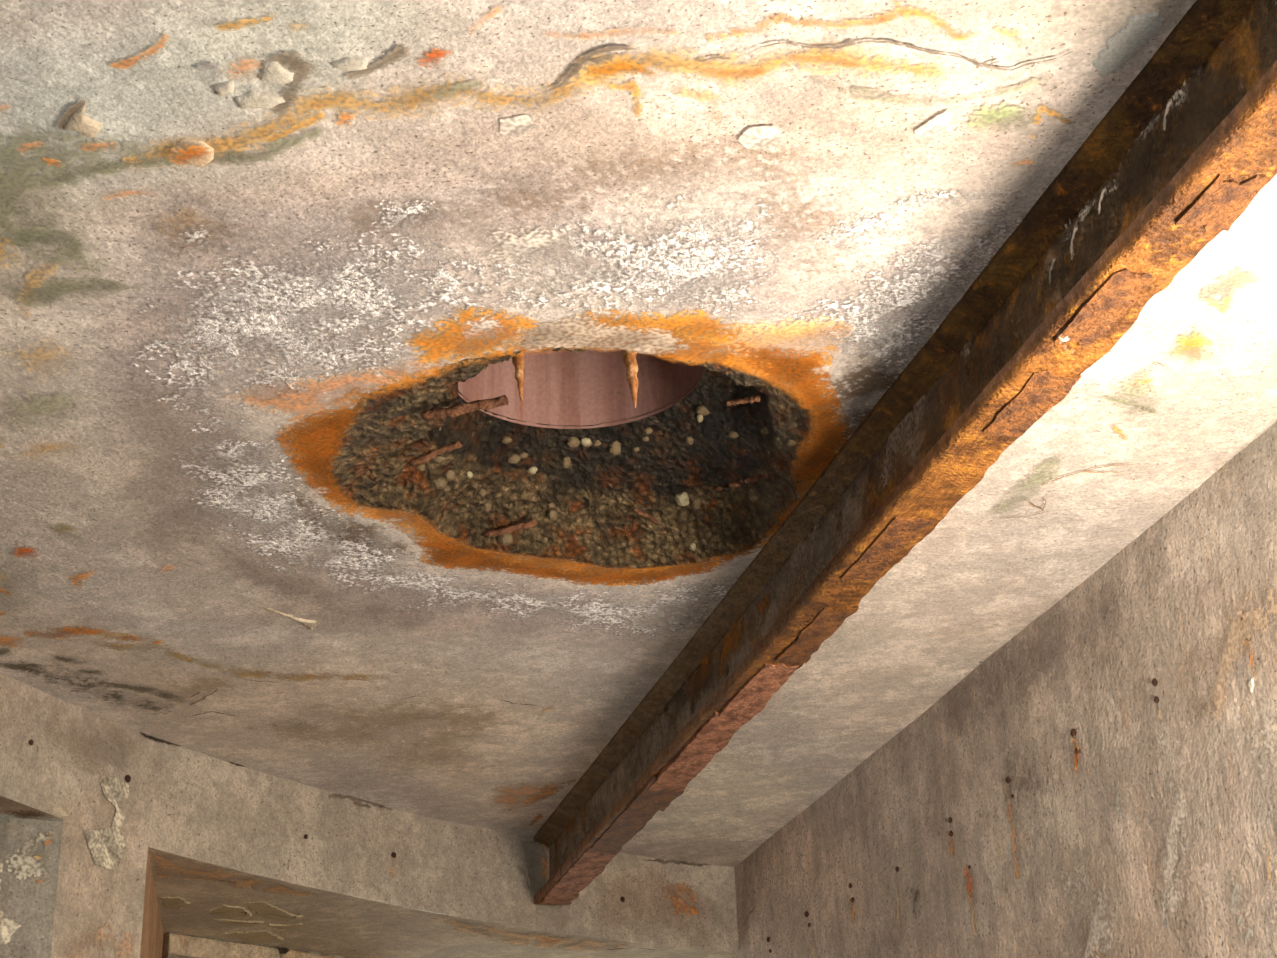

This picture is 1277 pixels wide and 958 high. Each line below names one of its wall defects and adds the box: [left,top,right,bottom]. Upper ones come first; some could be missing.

rust [205,48,939,157]
rust [707,1,974,41]
crack [698,40,1073,71]
rust [1033,106,1070,125]
leakage [0,209,127,308]
leakage [791,189,1023,440]
rust [1176,328,1212,353]
rust [1204,296,1234,312]
leakage [128,194,783,640]
rust [228,307,850,586]
spalling [328,317,816,569]